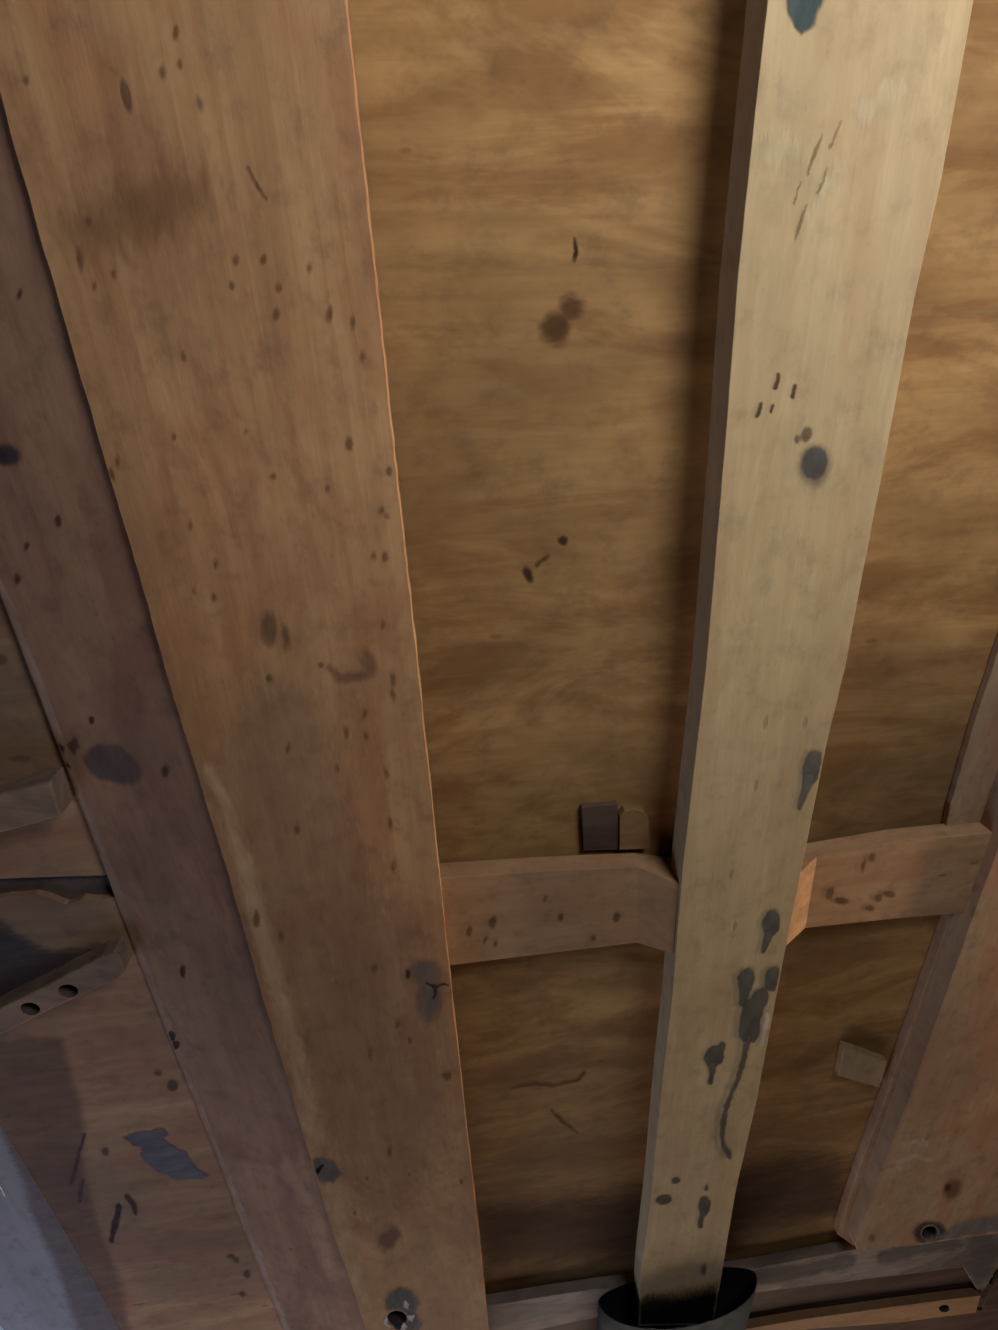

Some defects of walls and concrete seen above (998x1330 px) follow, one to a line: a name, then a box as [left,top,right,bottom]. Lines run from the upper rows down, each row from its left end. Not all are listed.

water stain [787,0,823,34]
water stain [543,299,579,340]
water stain [0,446,19,465]
water stain [795,427,827,478]
water stain [85,746,139,783]
water stain [798,751,822,810]
water stain [761,910,780,953]
water stain [704,967,779,1159]